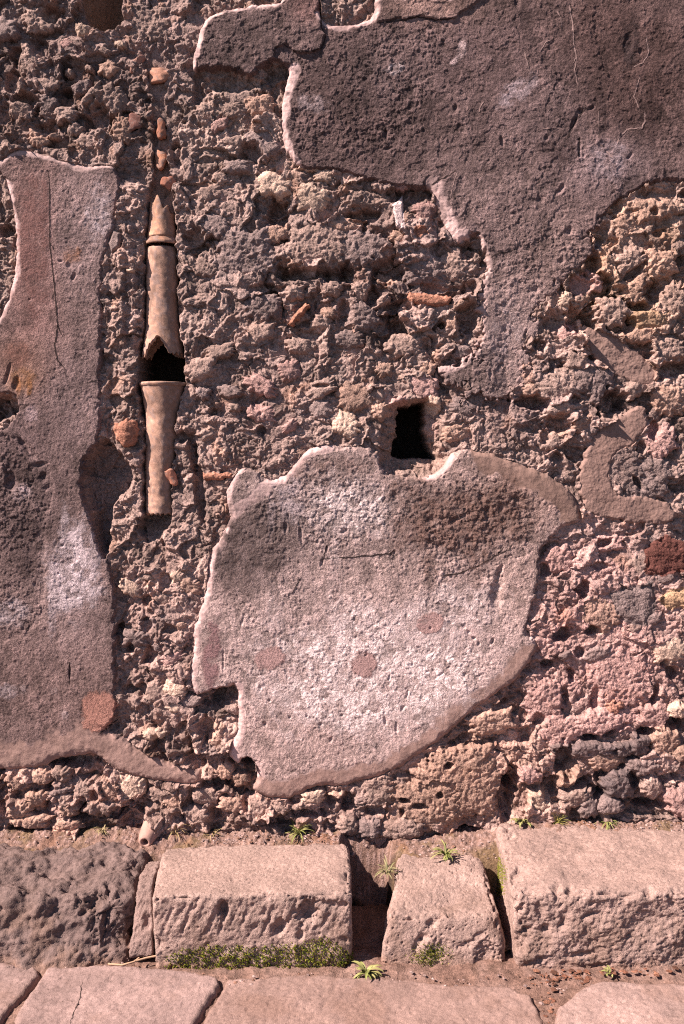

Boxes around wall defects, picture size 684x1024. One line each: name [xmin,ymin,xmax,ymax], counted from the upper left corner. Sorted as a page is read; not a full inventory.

crack [47,169,100,383]
spalling [0,0,684,768]